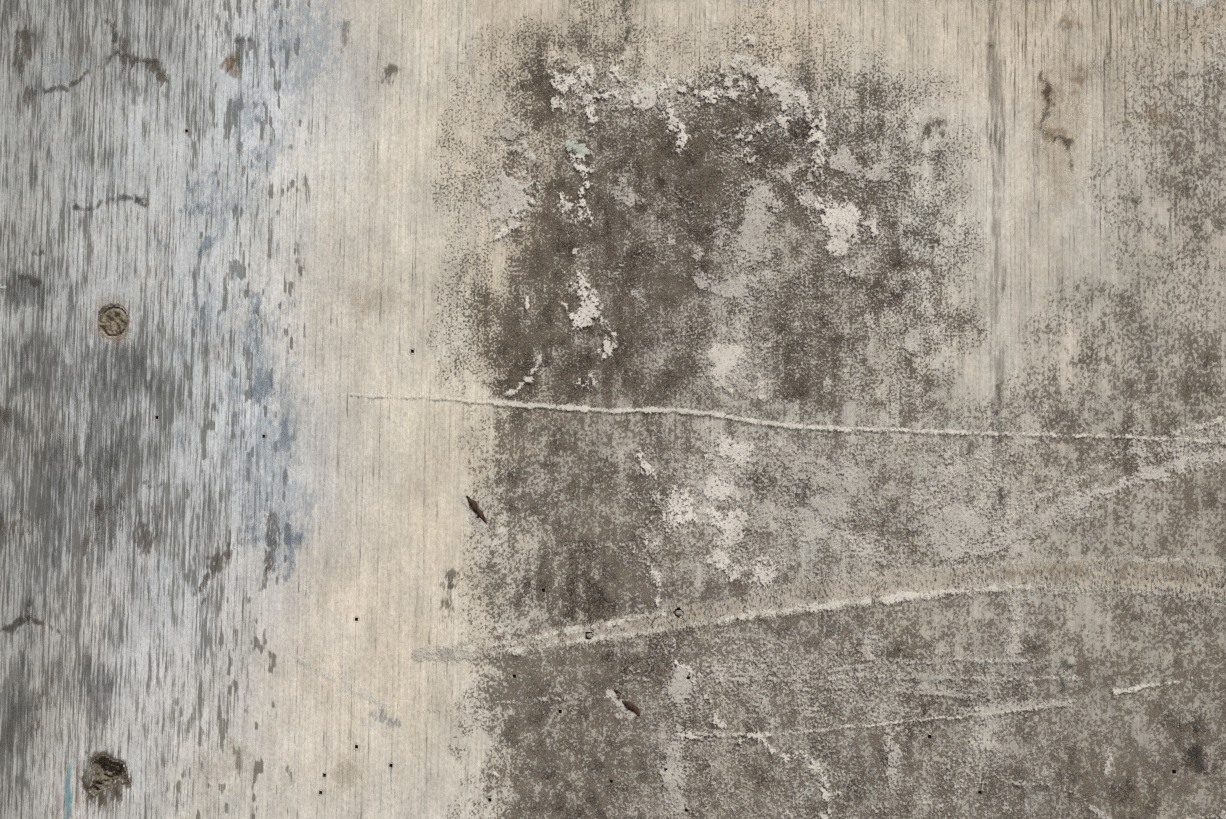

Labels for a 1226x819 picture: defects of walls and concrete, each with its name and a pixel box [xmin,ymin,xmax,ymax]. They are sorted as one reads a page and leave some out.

damp [351,0,1226,819]